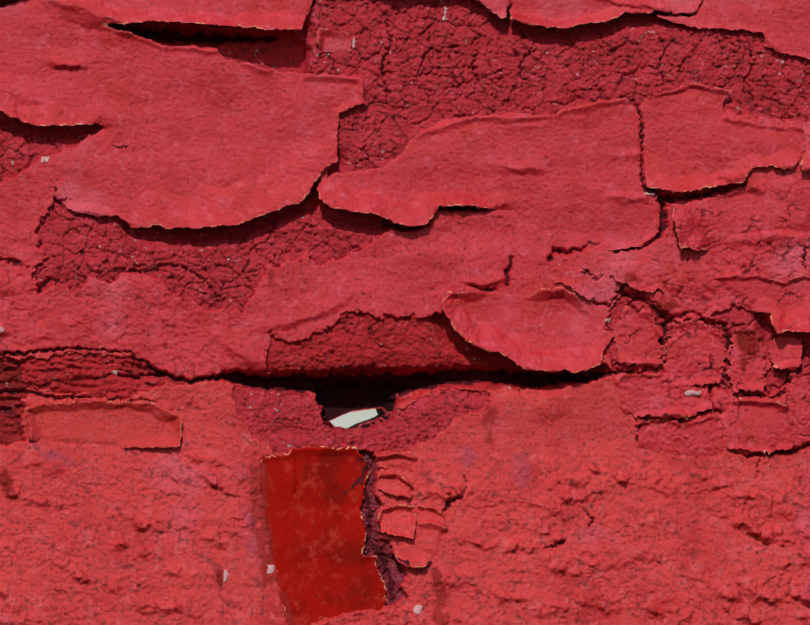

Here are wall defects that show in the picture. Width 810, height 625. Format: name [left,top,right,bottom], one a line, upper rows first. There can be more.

crack [452,52,485,93]
peeling [0,0,810,313]
crack [0,390,154,402]
peeling [0,353,186,448]
crack [0,347,634,396]
peeling [232,260,810,625]